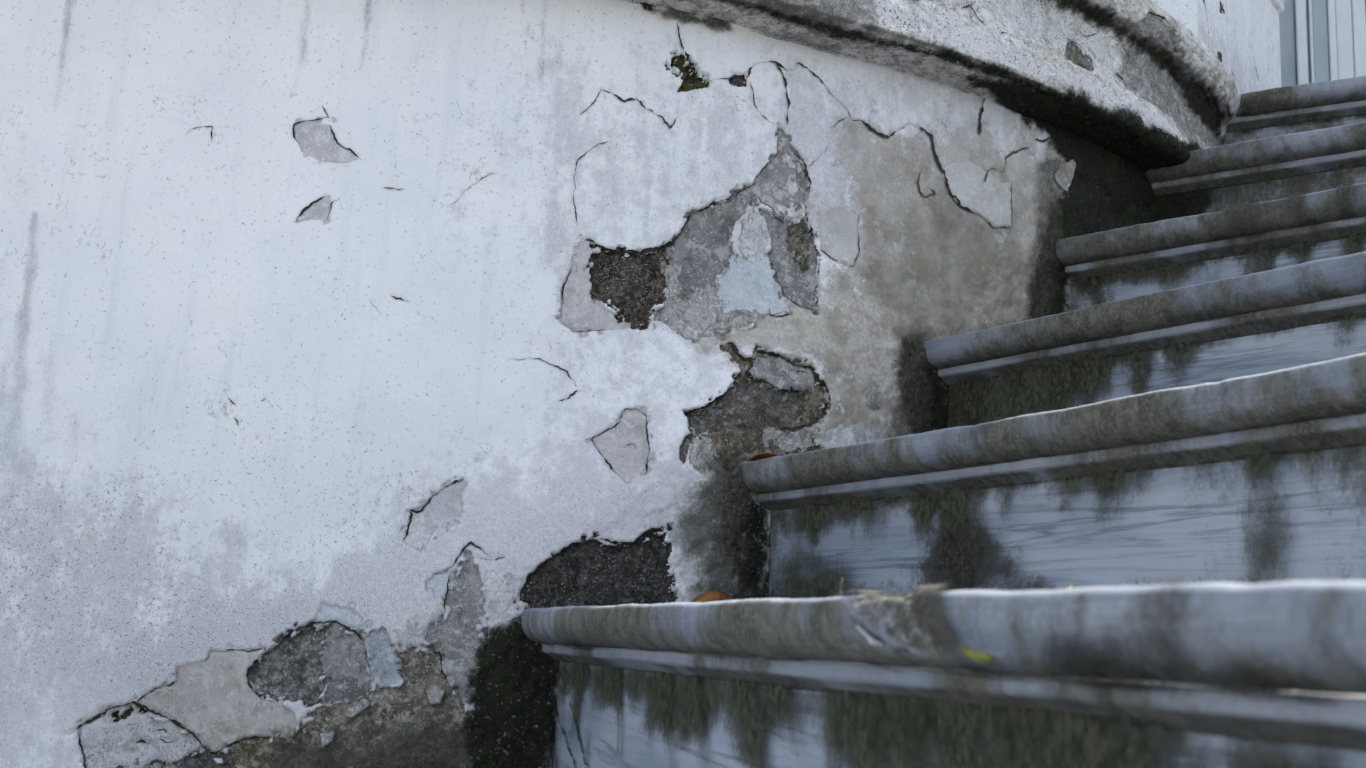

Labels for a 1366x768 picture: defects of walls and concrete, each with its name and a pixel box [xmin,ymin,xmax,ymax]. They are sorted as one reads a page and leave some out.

flaking render [665,24,747,92]
peeling [292,107,358,166]
peeling [294,195,340,224]
peeling [942,161,1012,229]
flaking render [556,128,860,483]
peeling [401,476,466,553]
flaking render [68,524,678,768]
damp [1039,574,1337,706]
damp [262,612,592,768]